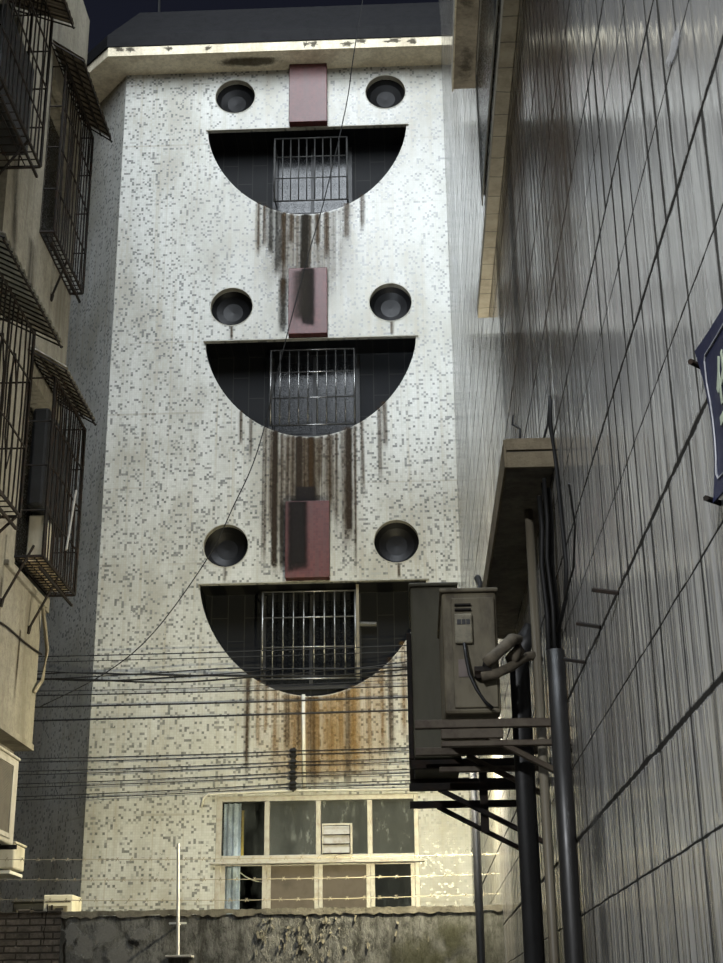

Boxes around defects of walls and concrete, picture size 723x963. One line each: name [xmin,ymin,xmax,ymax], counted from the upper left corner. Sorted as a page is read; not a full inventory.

rust [257,203,349,289]
rust [378,402,387,466]
rust [262,421,364,566]
rust [265,686,360,771]
rust [381,658,405,744]
peeling [279,916,340,963]